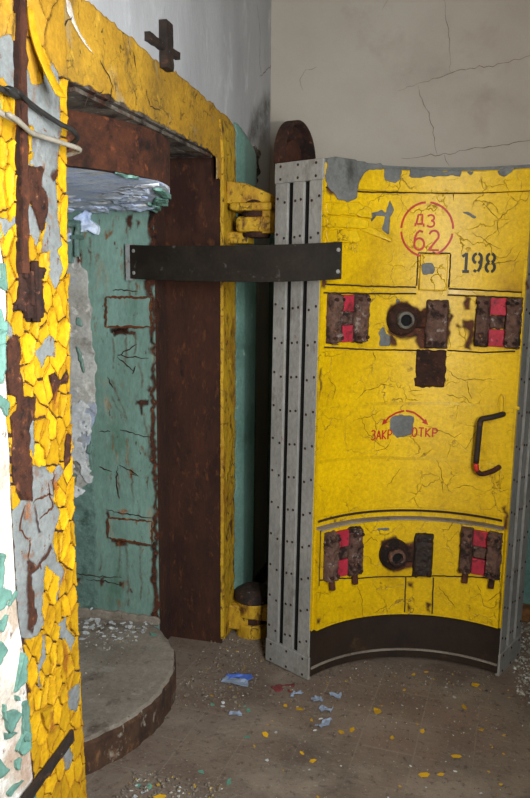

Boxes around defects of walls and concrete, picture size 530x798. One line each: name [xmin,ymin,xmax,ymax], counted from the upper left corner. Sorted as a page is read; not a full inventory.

crack [403,0,530,165]
rust [28,166,58,233]
rust [126,211,157,245]
crack [473,180,520,268]
rust [6,336,71,633]
peeling [0,0,171,798]
rust [104,280,161,619]